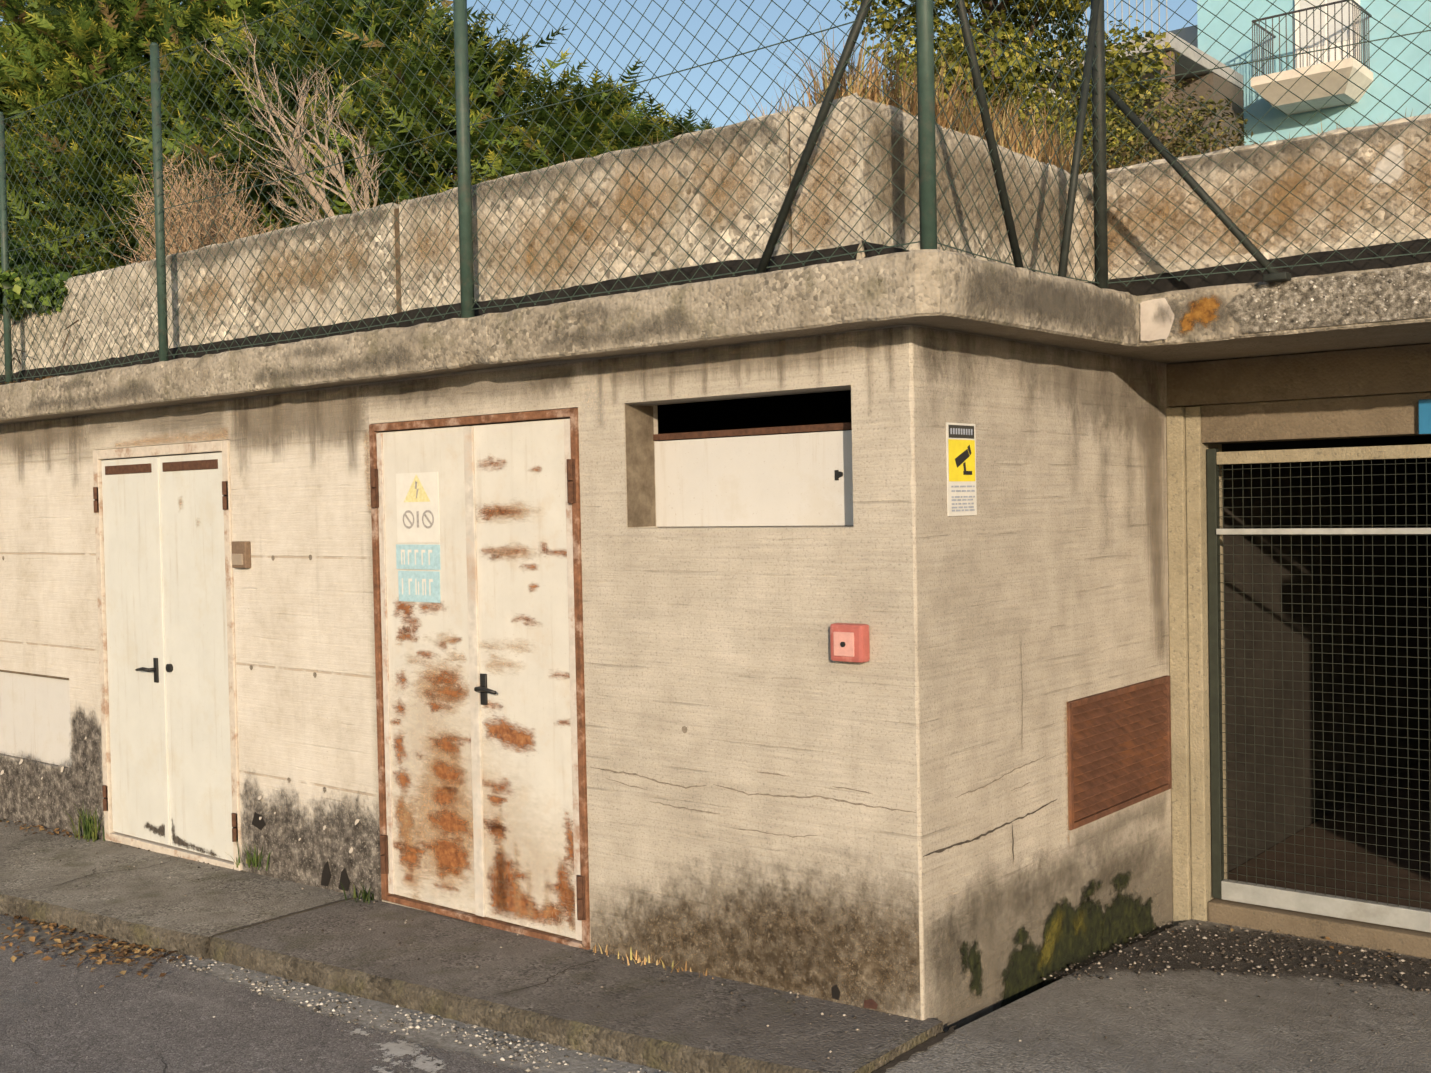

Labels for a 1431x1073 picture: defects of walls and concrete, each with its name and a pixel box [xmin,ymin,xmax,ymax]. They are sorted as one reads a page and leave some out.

corrosion [483,507,525,520]
corrosion [489,544,567,591]
corrosion [396,601,467,711]
corrosion [391,703,575,925]
crack [591,767,916,838]
crack [923,653,1057,861]
damp [591,881,920,1014]
damp [942,861,1173,1030]